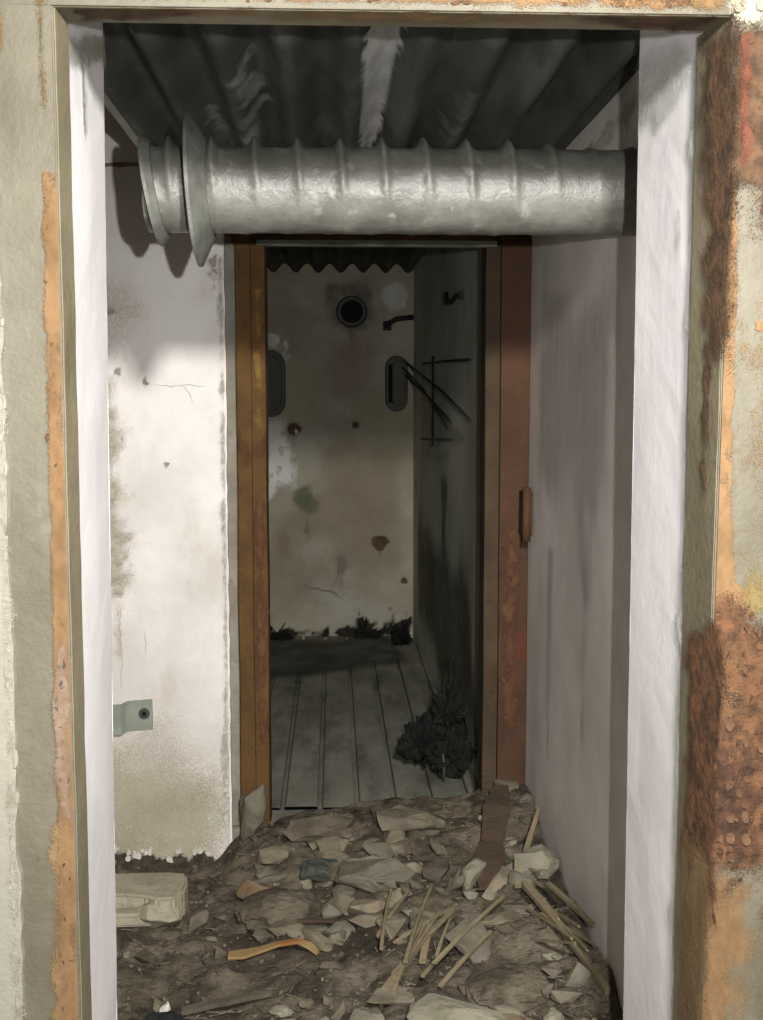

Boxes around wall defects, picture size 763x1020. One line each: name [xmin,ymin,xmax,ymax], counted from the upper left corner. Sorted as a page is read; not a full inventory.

leakage [106,272,154,661]
rust [264,0,763,1020]
peeling [51,638,73,820]